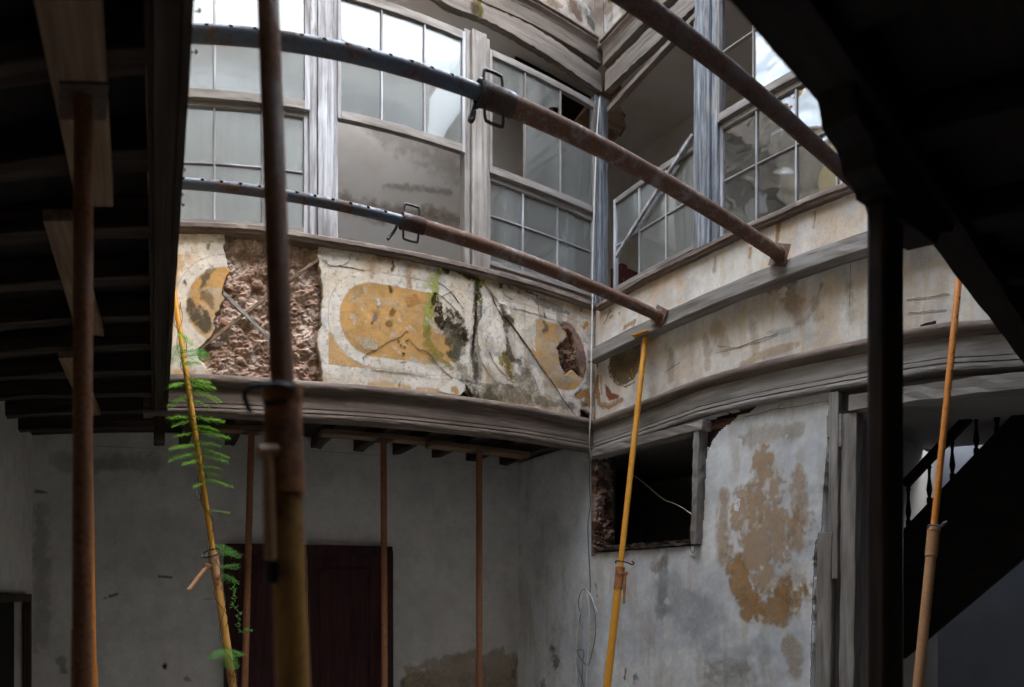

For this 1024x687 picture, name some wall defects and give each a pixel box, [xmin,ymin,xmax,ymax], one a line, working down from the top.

peeling [186,268,214,332]
crack [362,330,502,384]
mould [431,282,570,408]
crack [438,282,575,415]
spalling [542,307,641,418]
flaking render [706,407,756,455]